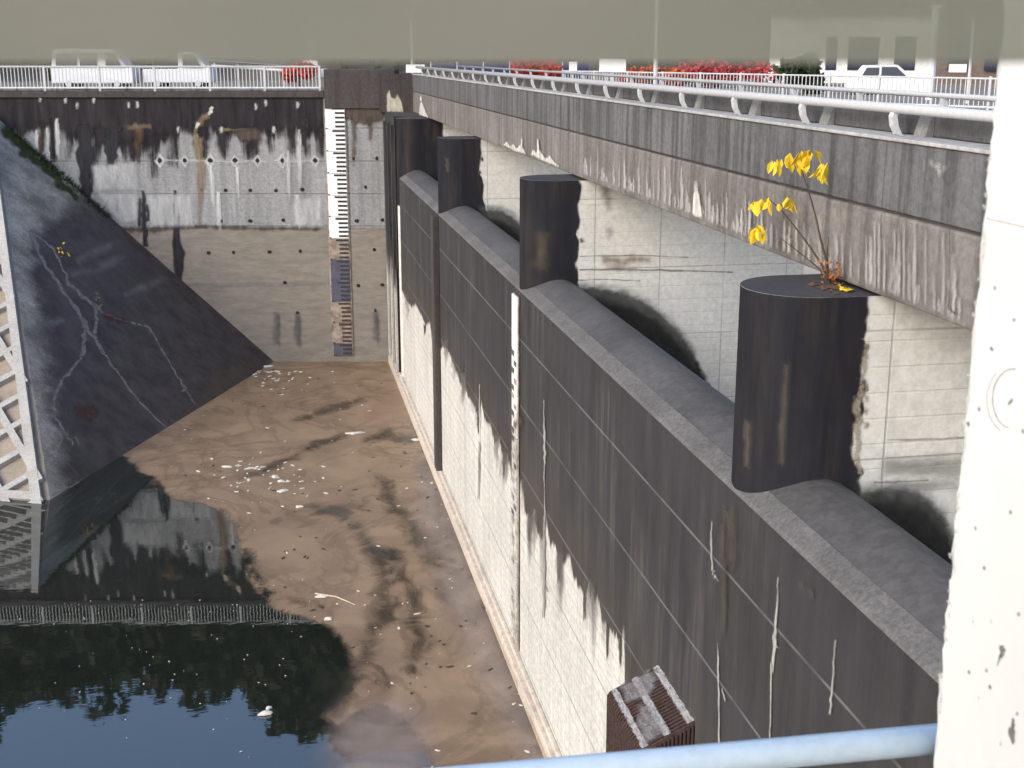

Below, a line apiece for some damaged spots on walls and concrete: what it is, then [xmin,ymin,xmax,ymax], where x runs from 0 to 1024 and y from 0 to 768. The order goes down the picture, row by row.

damp [0,88,389,362]
corrosion [195,130,204,217]
damp [585,153,718,223]
damp [733,204,790,251]
damp [866,246,900,294]
crack [29,231,201,451]
crack [540,413,548,465]
peeling [853,344,869,474]
crack [541,497,549,618]
crack [717,657,725,743]
crack [769,600,778,737]